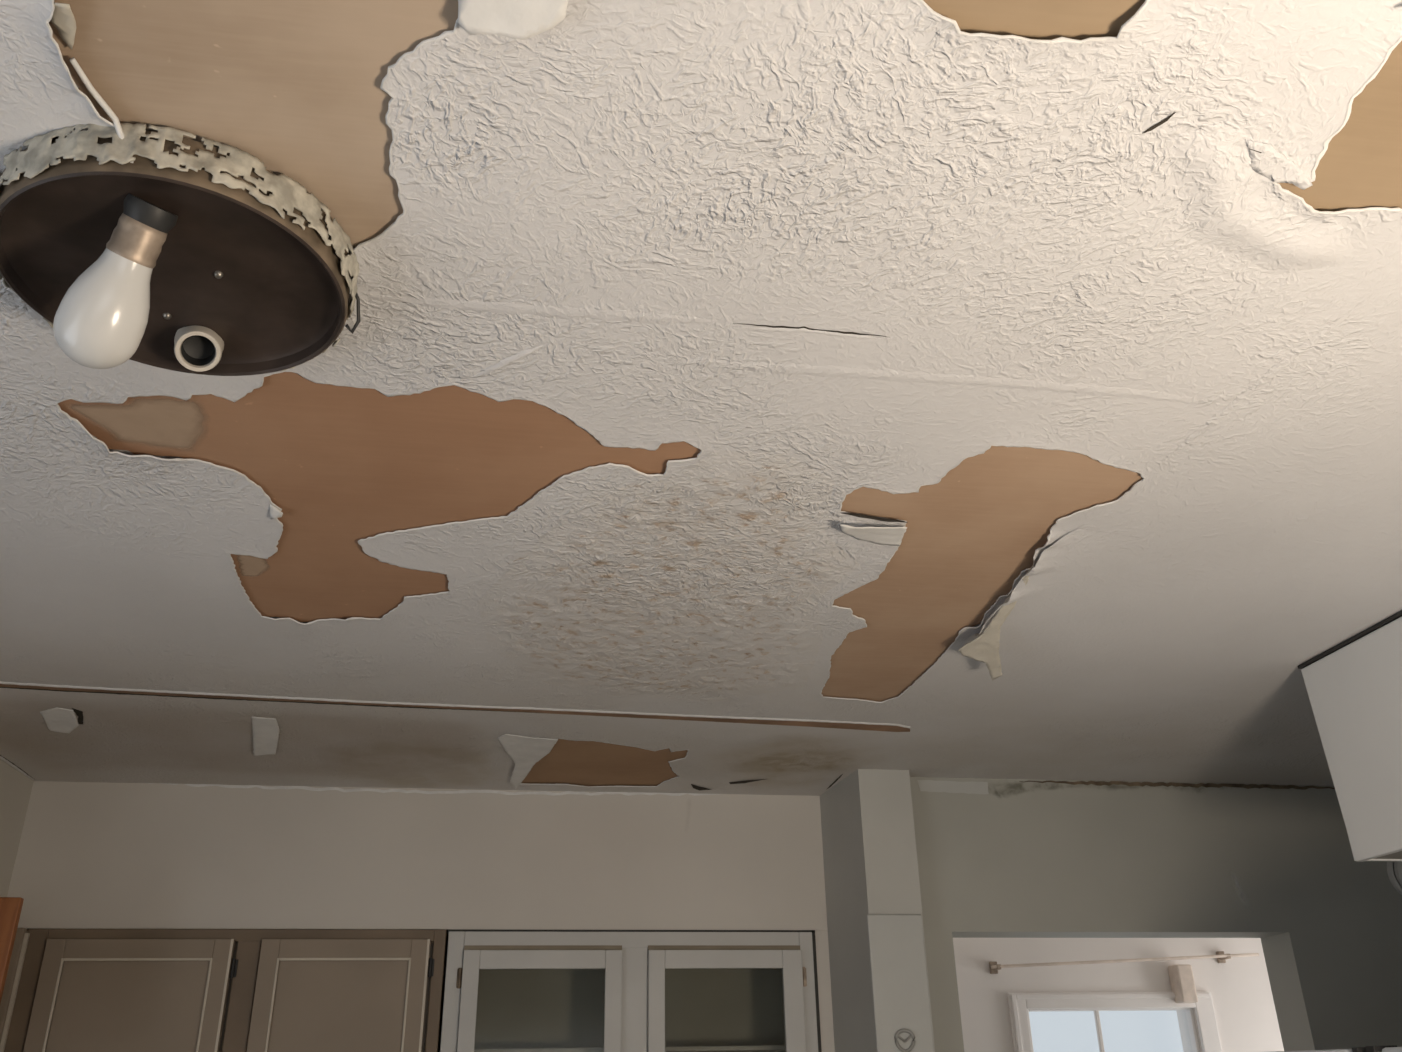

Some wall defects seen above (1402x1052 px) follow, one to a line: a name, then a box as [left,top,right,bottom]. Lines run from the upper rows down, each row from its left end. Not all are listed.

peeling [44,0,568,254]
peeling [918,0,1150,44]
peeling [1245,37,1402,214]
peeling [55,370,703,625]
peeling [820,445,1145,703]
peeling [498,734,689,789]